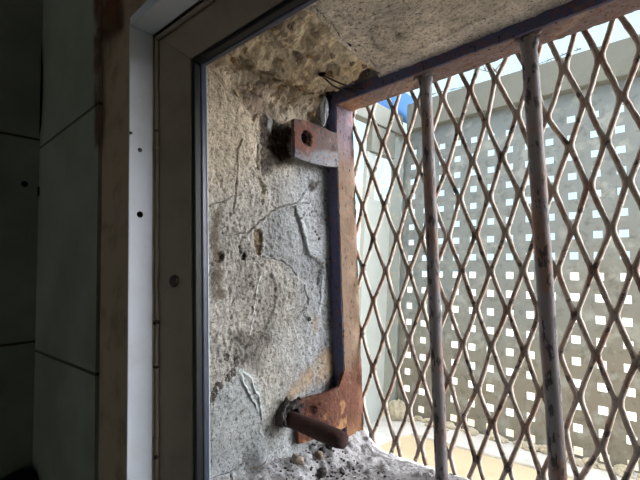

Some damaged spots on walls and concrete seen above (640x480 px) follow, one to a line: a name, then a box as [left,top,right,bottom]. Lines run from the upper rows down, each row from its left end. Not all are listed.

flaking render [207,10,374,127]